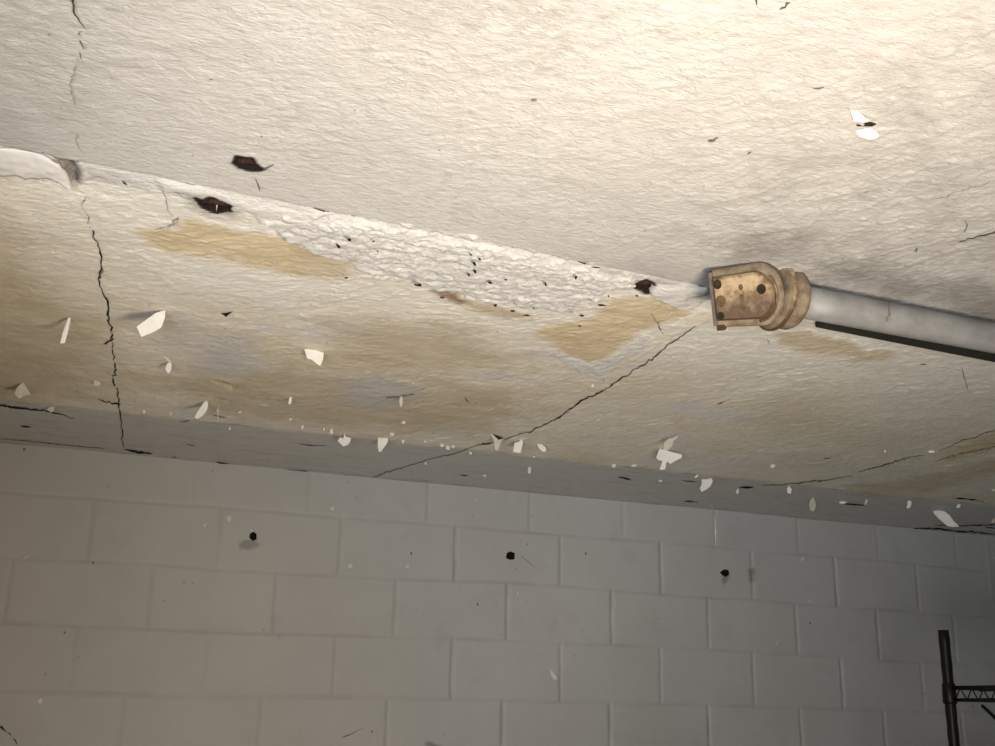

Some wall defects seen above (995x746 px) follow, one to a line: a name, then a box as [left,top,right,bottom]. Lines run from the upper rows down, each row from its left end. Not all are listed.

crack [70,0,85,105]
damp [125,213,367,286]
peeling [60,317,71,344]
crack [0,198,177,458]
peeling [137,310,166,337]
peeling [304,349,324,366]
damp [0,227,700,445]
crack [375,313,696,477]
damp [685,371,894,449]
peeling [656,435,682,482]
damp [830,427,995,498]
peeling [933,504,961,527]